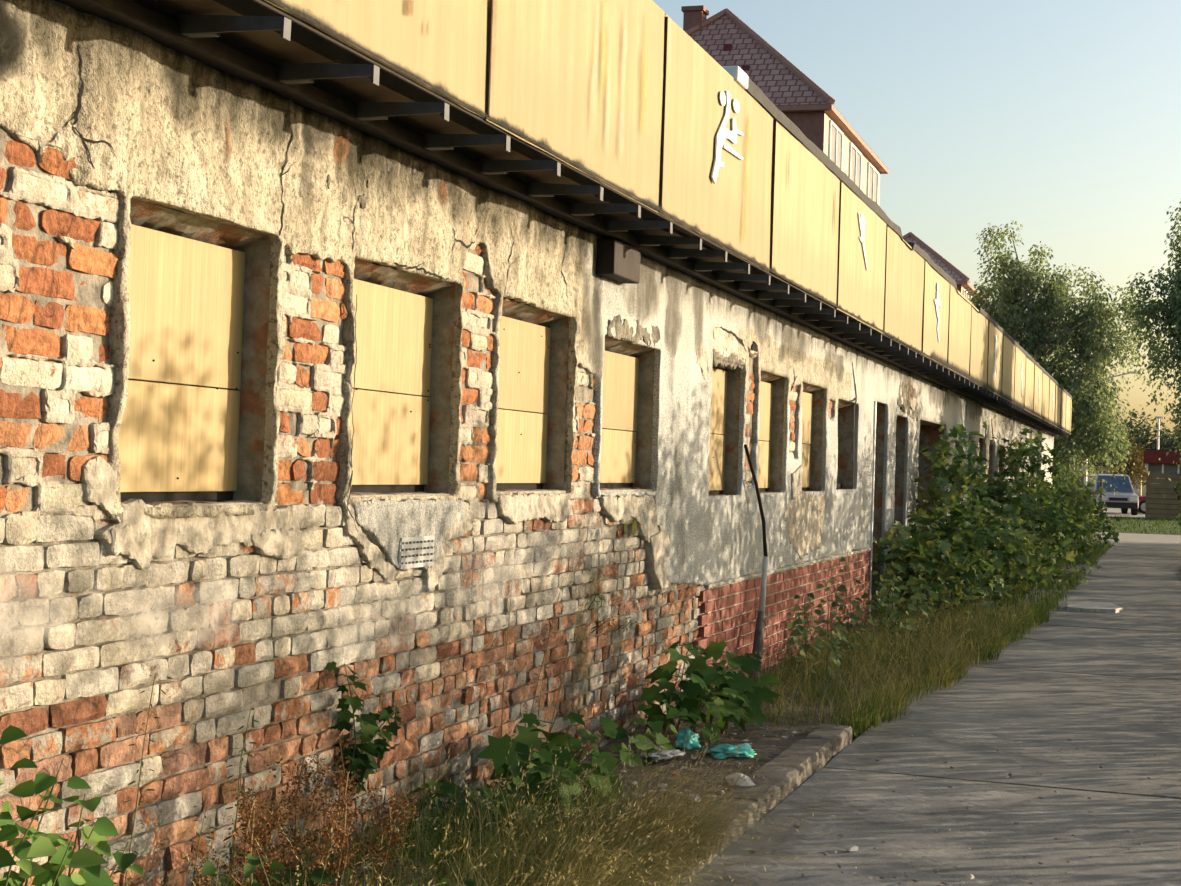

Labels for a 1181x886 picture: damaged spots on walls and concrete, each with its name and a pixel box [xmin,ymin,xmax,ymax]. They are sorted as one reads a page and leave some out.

damp [0,2,24,81]
crack [65,45,116,169]
crack [279,105,296,235]
spalling [326,174,370,209]
spalling [605,315,660,350]
flaking render [78,456,305,570]
flaking render [336,497,472,592]
flaking render [496,492,573,524]
flaking render [596,494,671,589]
spalling [784,465,827,560]